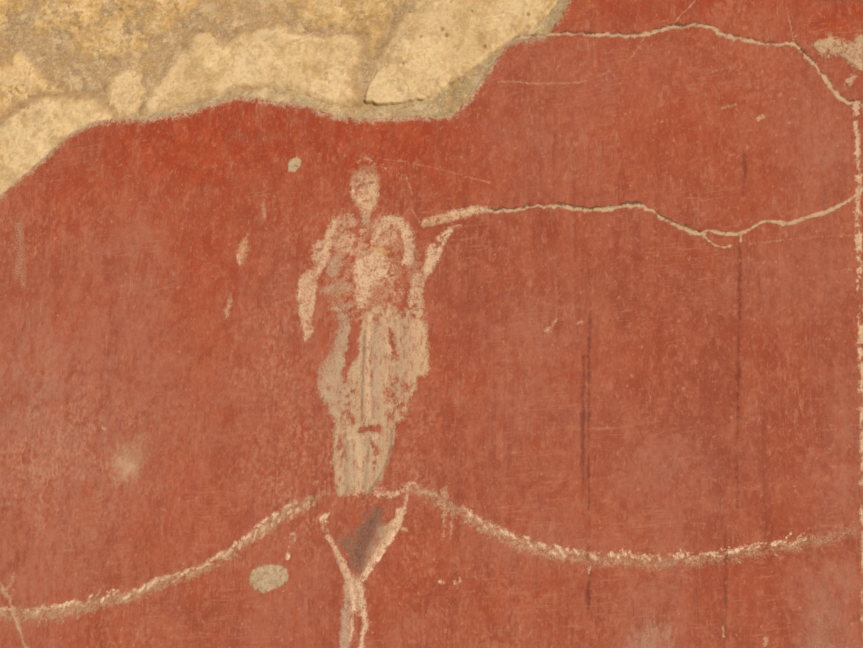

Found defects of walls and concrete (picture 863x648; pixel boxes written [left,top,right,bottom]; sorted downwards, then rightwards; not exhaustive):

crack [516,3,858,105]
spalling [813,28,863,87]
peeling [288,157,301,172]
crack [482,187,863,249]
peeling [235,233,250,266]
crack [0,572,30,648]